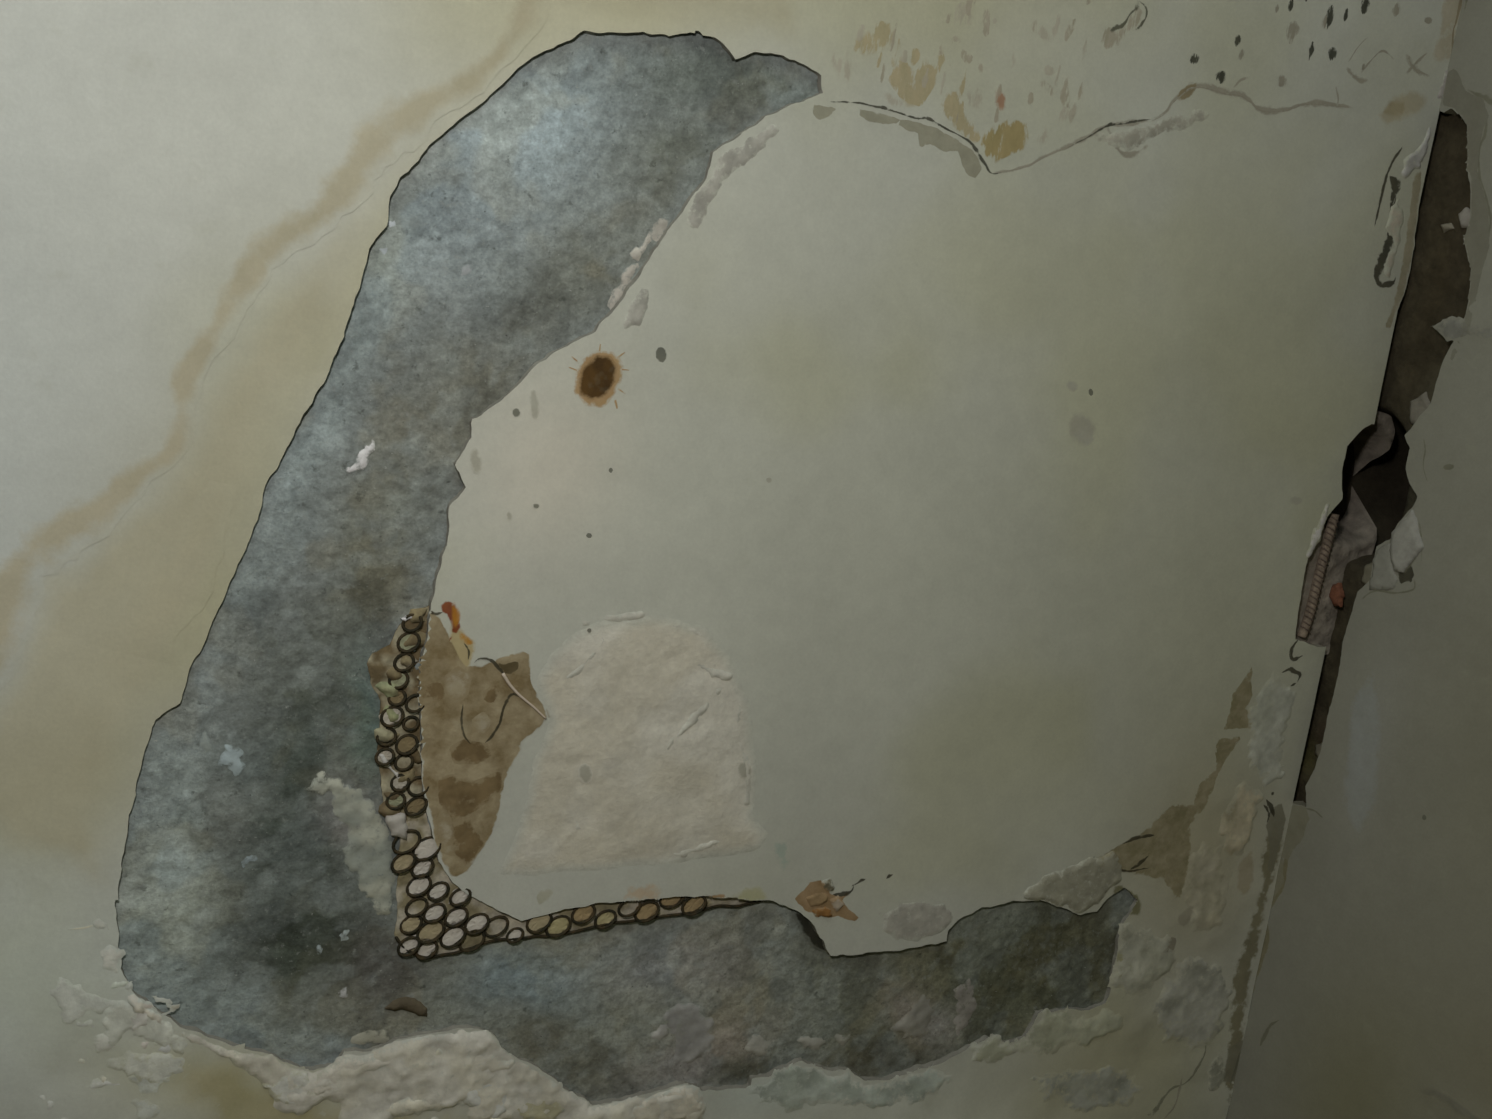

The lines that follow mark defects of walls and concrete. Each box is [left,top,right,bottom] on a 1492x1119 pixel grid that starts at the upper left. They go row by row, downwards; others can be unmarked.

damp [0,0,810,900]
rust [568,344,629,409]
spalling [115,0,1253,1119]
crack [813,0,1468,328]
spalling [1282,109,1471,807]